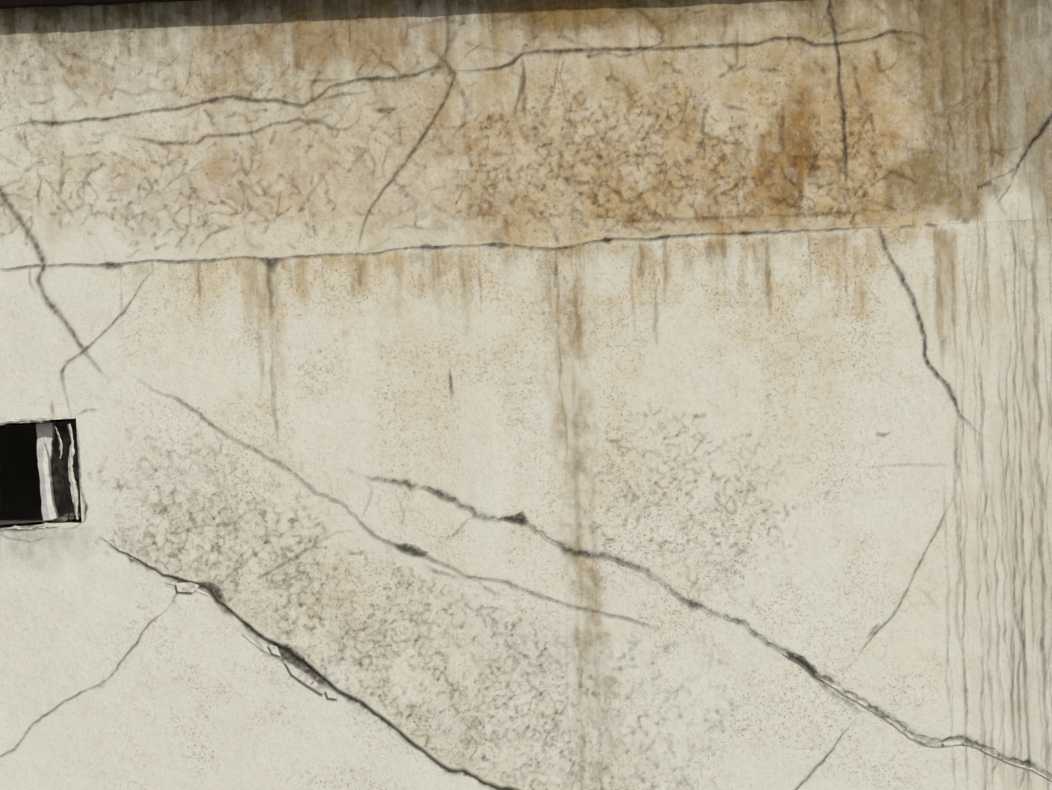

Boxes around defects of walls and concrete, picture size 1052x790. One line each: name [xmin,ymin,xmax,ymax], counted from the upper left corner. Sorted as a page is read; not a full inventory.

crack [47,95,318,144]
crack [488,1,896,160]
corrosion [550,0,1008,226]
crack [996,104,1051,155]
crack [591,217,703,242]
crack [883,240,959,411]
spalling [176,582,225,601]
crack [164,577,352,701]
spalling [269,643,338,699]
crack [736,618,1052,781]